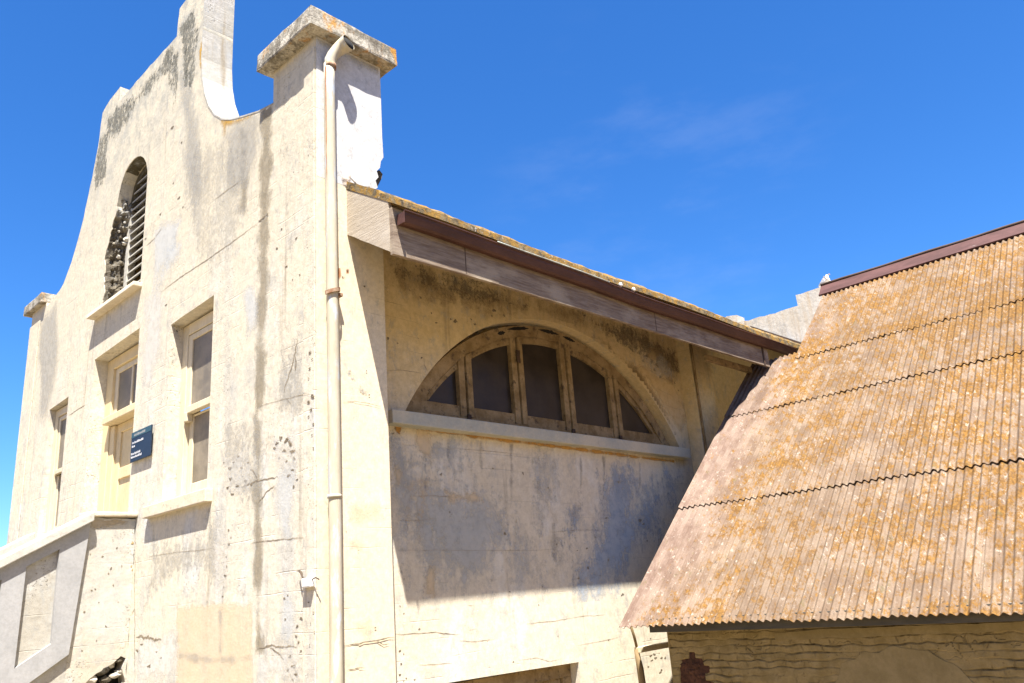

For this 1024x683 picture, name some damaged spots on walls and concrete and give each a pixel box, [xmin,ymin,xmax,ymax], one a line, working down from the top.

leakage [94,9,200,193]
leakage [228,106,273,459]
crack [262,338,310,406]
leakage [252,475,262,588]
crack [242,469,277,501]